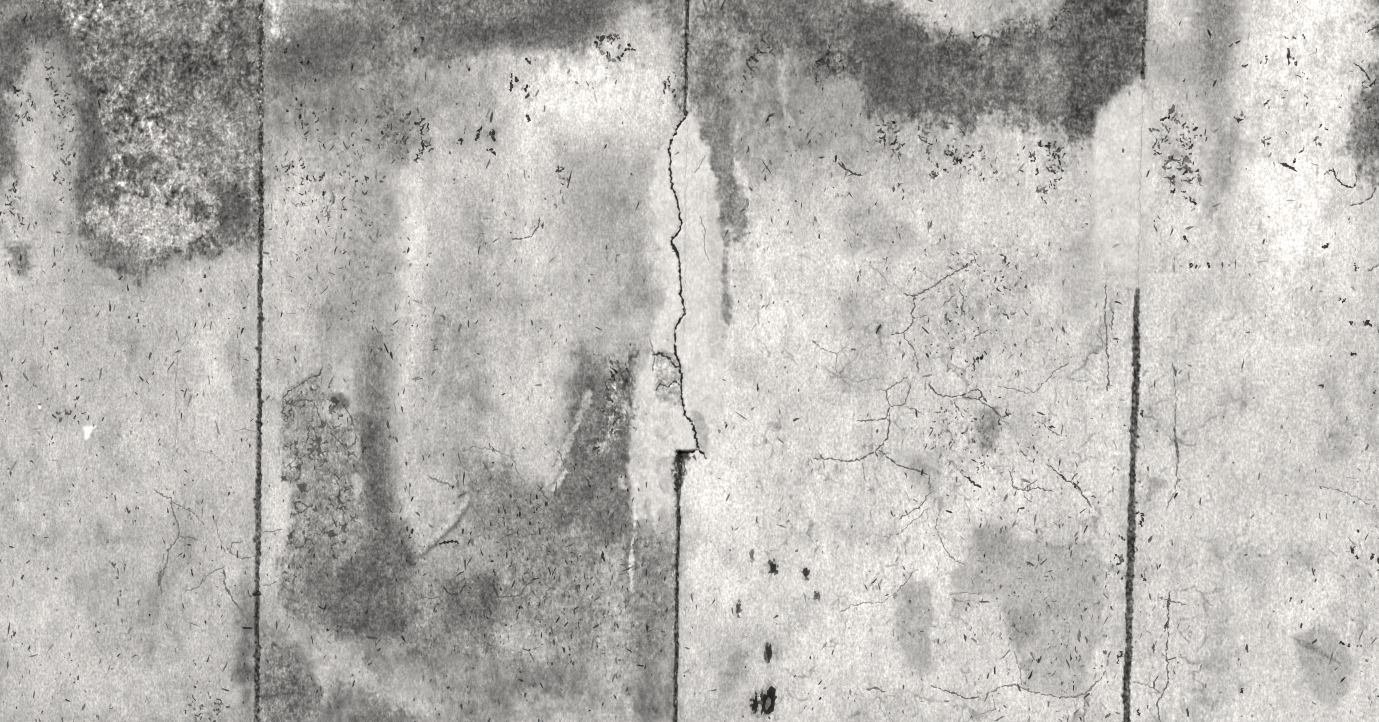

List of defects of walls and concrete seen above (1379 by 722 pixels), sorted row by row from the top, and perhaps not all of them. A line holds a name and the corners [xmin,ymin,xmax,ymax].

leakage [0,0,279,298]
crack [649,114,709,494]
leakage [247,0,1259,722]
crack [812,254,1092,595]
spalling [718,101,1209,722]
crack [1096,80,1145,386]
leakage [1328,0,1379,215]
crack [840,572,913,612]
crack [931,591,1186,722]